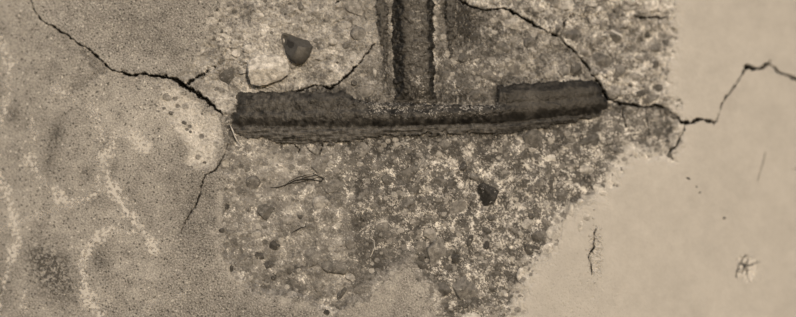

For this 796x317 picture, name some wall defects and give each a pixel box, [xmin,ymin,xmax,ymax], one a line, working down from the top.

crack [30,0,222,114]
crack [287,44,375,92]
crack [459,0,796,152]
crack [181,144,228,231]
spalling [151,0,689,317]
peeling [736,251,763,283]